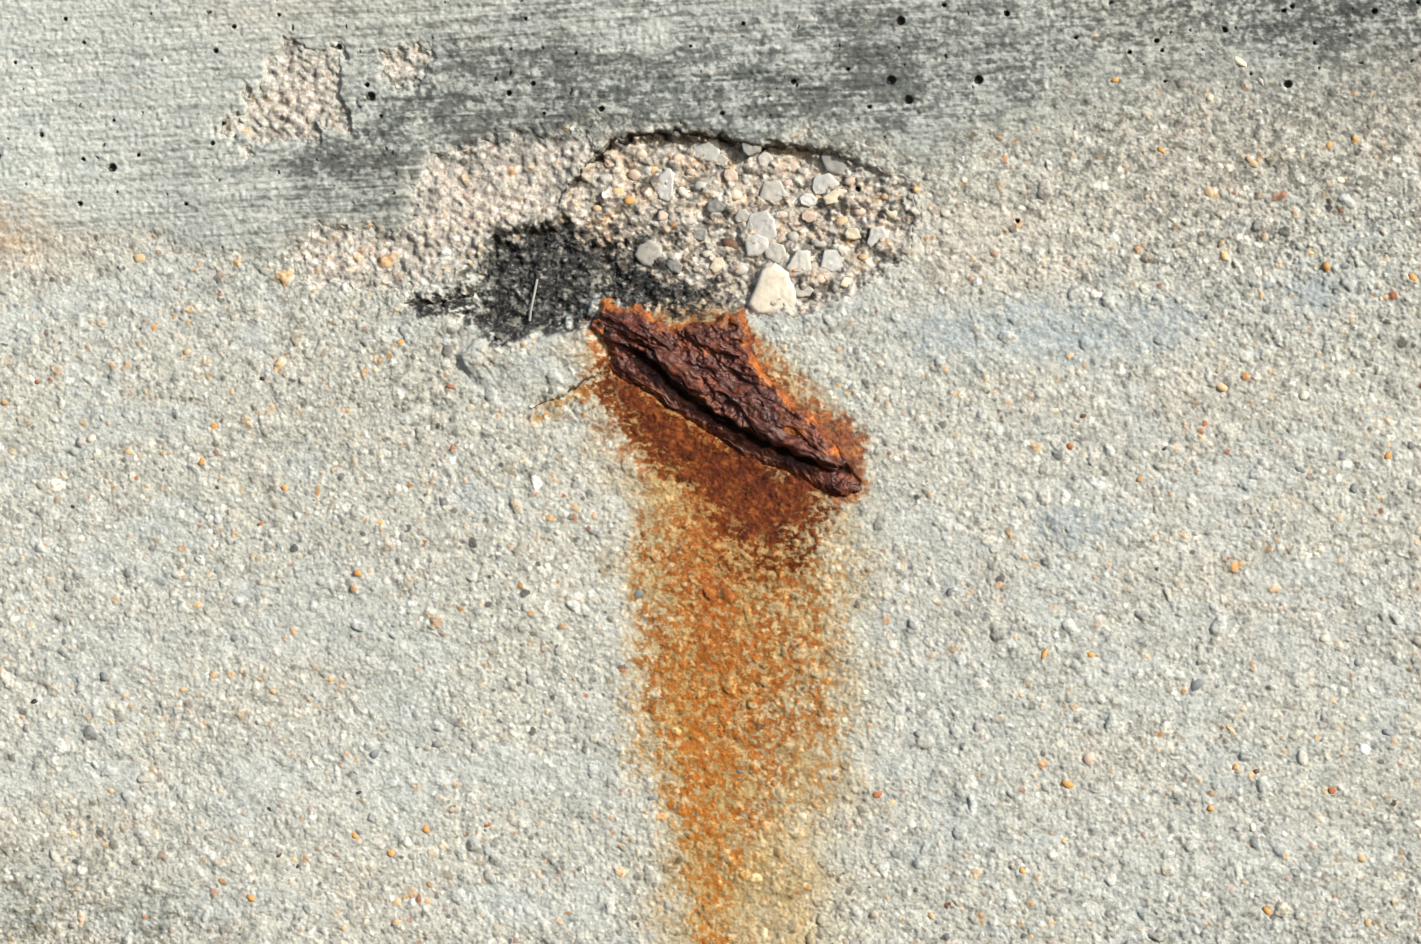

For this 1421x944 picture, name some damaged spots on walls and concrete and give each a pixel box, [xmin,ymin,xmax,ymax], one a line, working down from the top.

peeling [220,37,352,158]
leakage [408,214,739,346]
spalling [286,127,921,319]
corrosion [535,297,870,944]